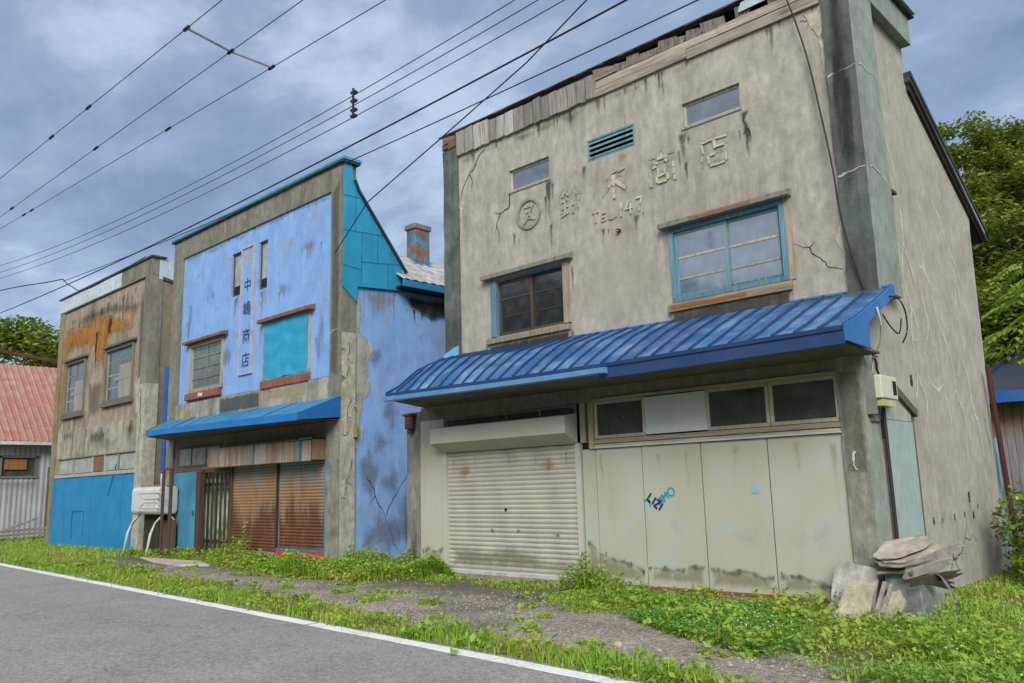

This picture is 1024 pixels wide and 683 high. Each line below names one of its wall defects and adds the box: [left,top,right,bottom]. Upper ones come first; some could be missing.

crack [460,149,484,201]
crack [494,194,511,241]
crack [795,242,847,273]
corrosion [59,306,135,428]
peeling [342,290,372,450]
crack [346,460,407,548]